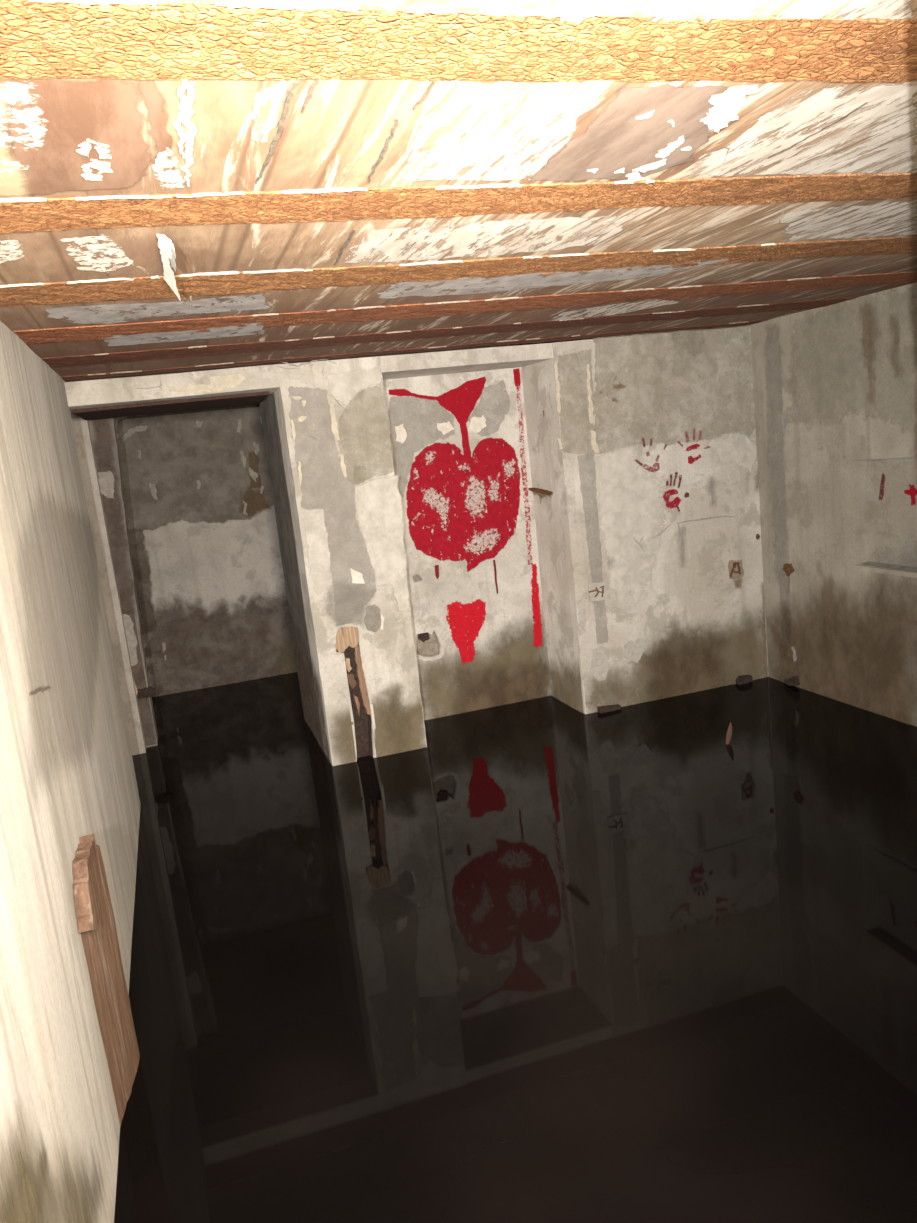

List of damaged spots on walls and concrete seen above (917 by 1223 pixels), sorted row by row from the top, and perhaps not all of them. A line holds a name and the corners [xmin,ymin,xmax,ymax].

peeling [215,0,360,11]
peeling [406,5,457,14]
peeling [0,81,48,173]
peeling [614,84,917,184]
peeling [0,240,25,264]
peeling [45,234,313,355]
peeling [163,362,246,393]
water stain [24,394,356,777]
peeling [289,381,510,758]
water stain [373,293,917,757]